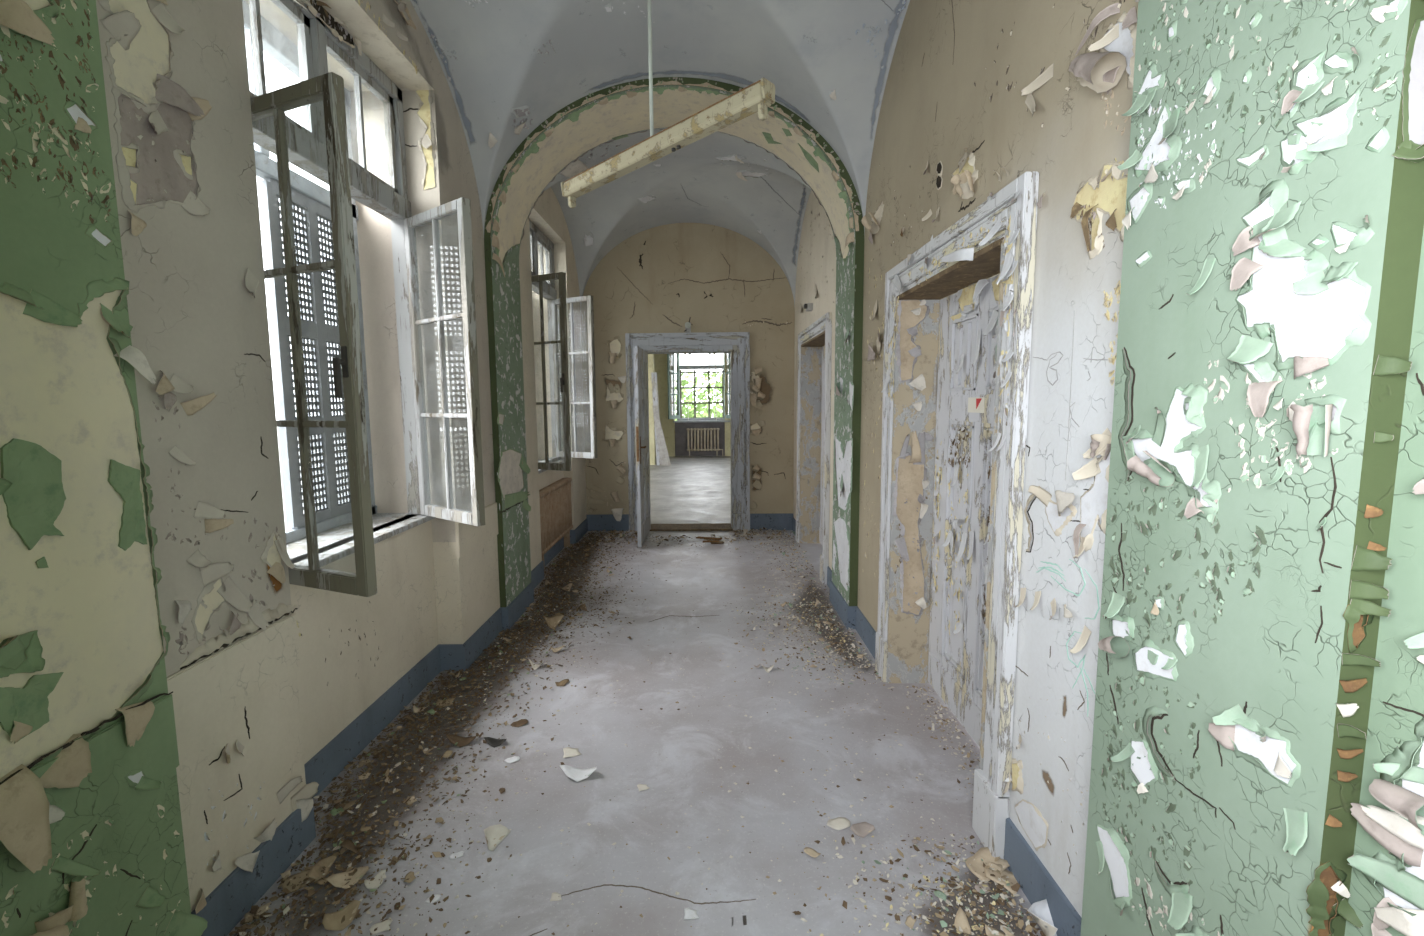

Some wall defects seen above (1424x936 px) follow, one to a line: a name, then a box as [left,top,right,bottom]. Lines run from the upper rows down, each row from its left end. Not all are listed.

spalling [294,0,362,56]
peeling [484,77,742,284]
crack [617,241,792,327]
peeling [603,336,626,409]
peeling [716,105,1021,640]
peeling [497,377,531,517]
peeling [586,425,626,521]
peeling [985,0,1424,936]
peeling [0,277,319,936]
crack [1077,653,1236,830]
peeling [281,855,386,931]
crack [1141,861,1190,936]